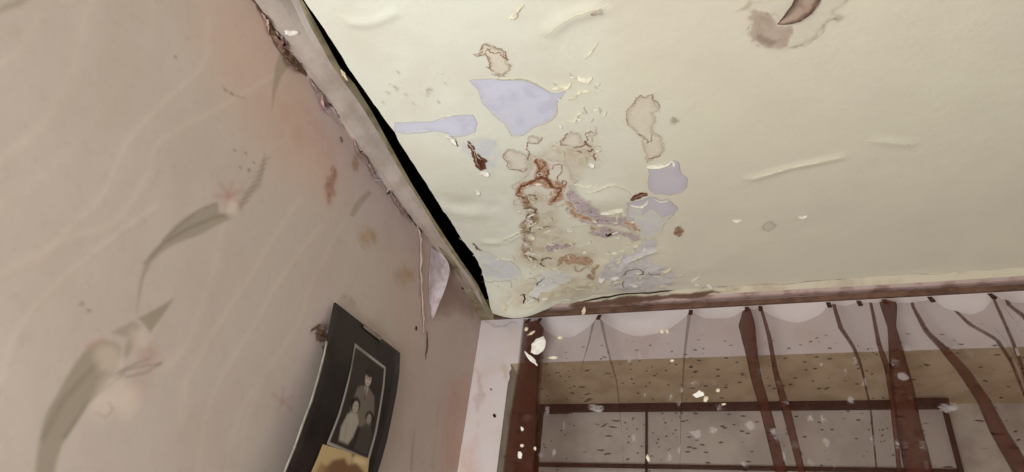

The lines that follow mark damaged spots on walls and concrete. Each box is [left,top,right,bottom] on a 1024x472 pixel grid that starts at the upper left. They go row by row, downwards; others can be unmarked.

leakage [266,76,360,208]
leakage [473,43,512,77]
peeling [395,73,606,178]
leakage [626,95,665,163]
peeling [459,161,688,315]
leakage [483,130,720,328]